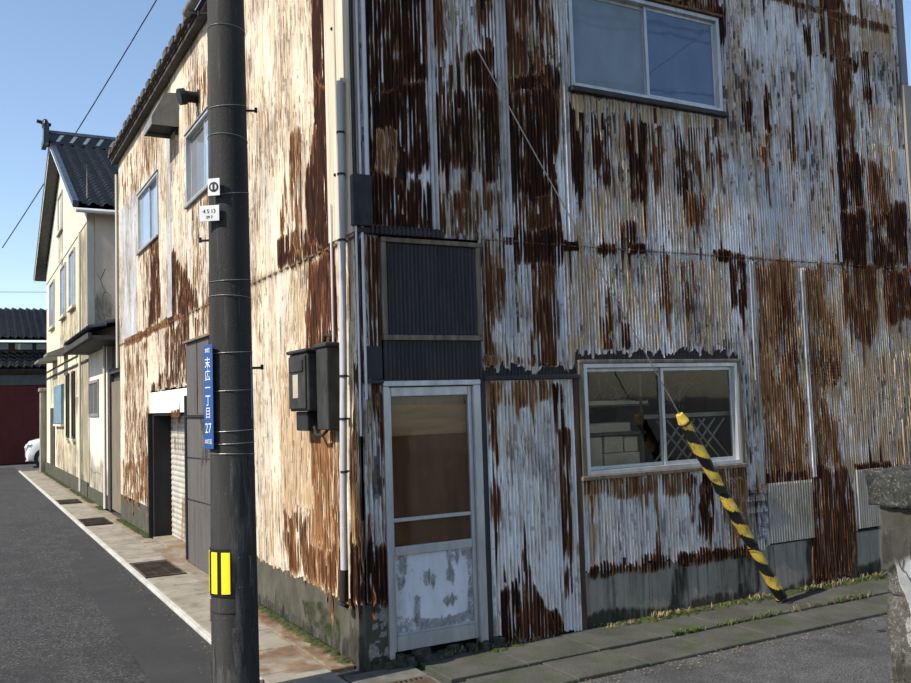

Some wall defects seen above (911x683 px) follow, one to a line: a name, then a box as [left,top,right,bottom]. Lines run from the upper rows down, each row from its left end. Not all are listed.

rust [122,192,209,518]
rust [277,0,388,625]
rust [365,0,911,643]
damp [213,455,367,683]
peeling [368,548,474,661]